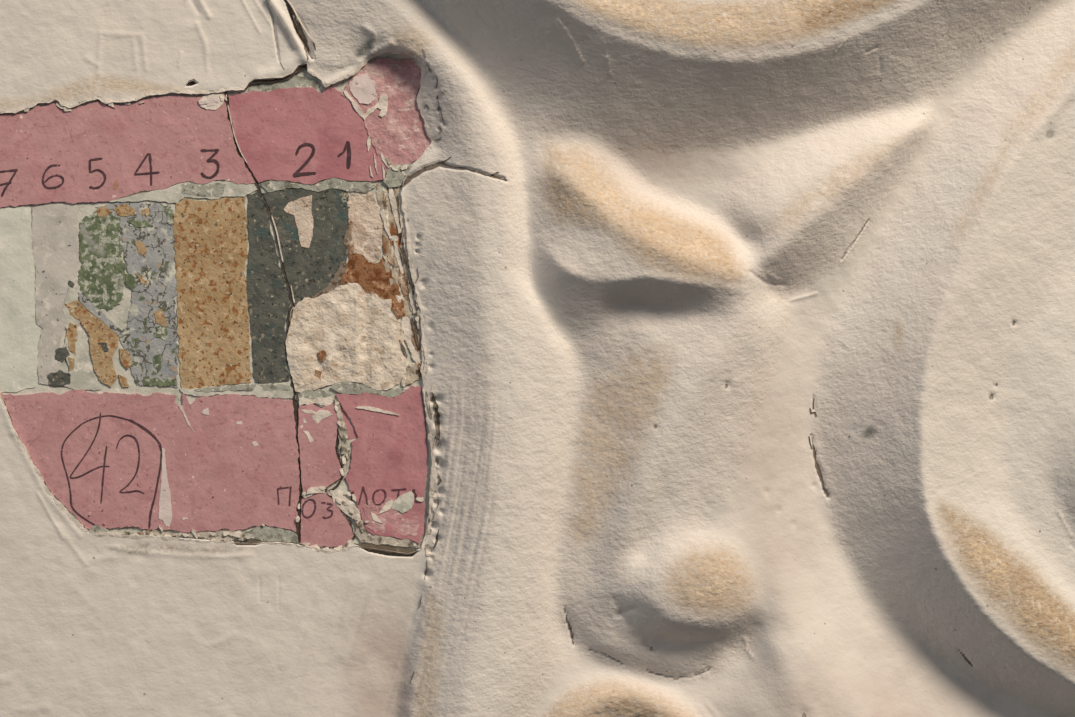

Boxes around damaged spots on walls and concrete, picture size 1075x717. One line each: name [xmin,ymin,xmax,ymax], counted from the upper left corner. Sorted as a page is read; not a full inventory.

crack [225,0,316,333]
crack [401,49,507,187]
peeling [0,48,442,576]
crack [290,376,355,543]
crack [809,399,829,496]